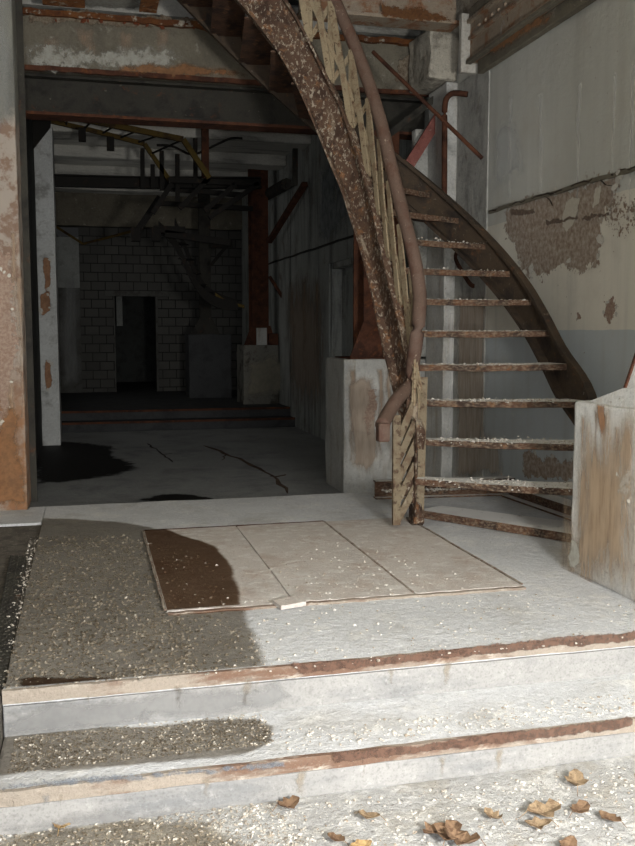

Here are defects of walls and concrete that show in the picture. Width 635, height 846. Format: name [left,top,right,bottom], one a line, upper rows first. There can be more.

corrosion [381,1,451,22]
peeling [504,168,635,283]
peeling [602,296,617,324]
corrosion [0,380,25,504]
crack [203,445,288,493]
water stain [349,371,391,469]
water stain [570,418,632,579]
water stain [144,529,239,610]
corrosion [291,630,635,674]
corrosion [333,716,633,763]